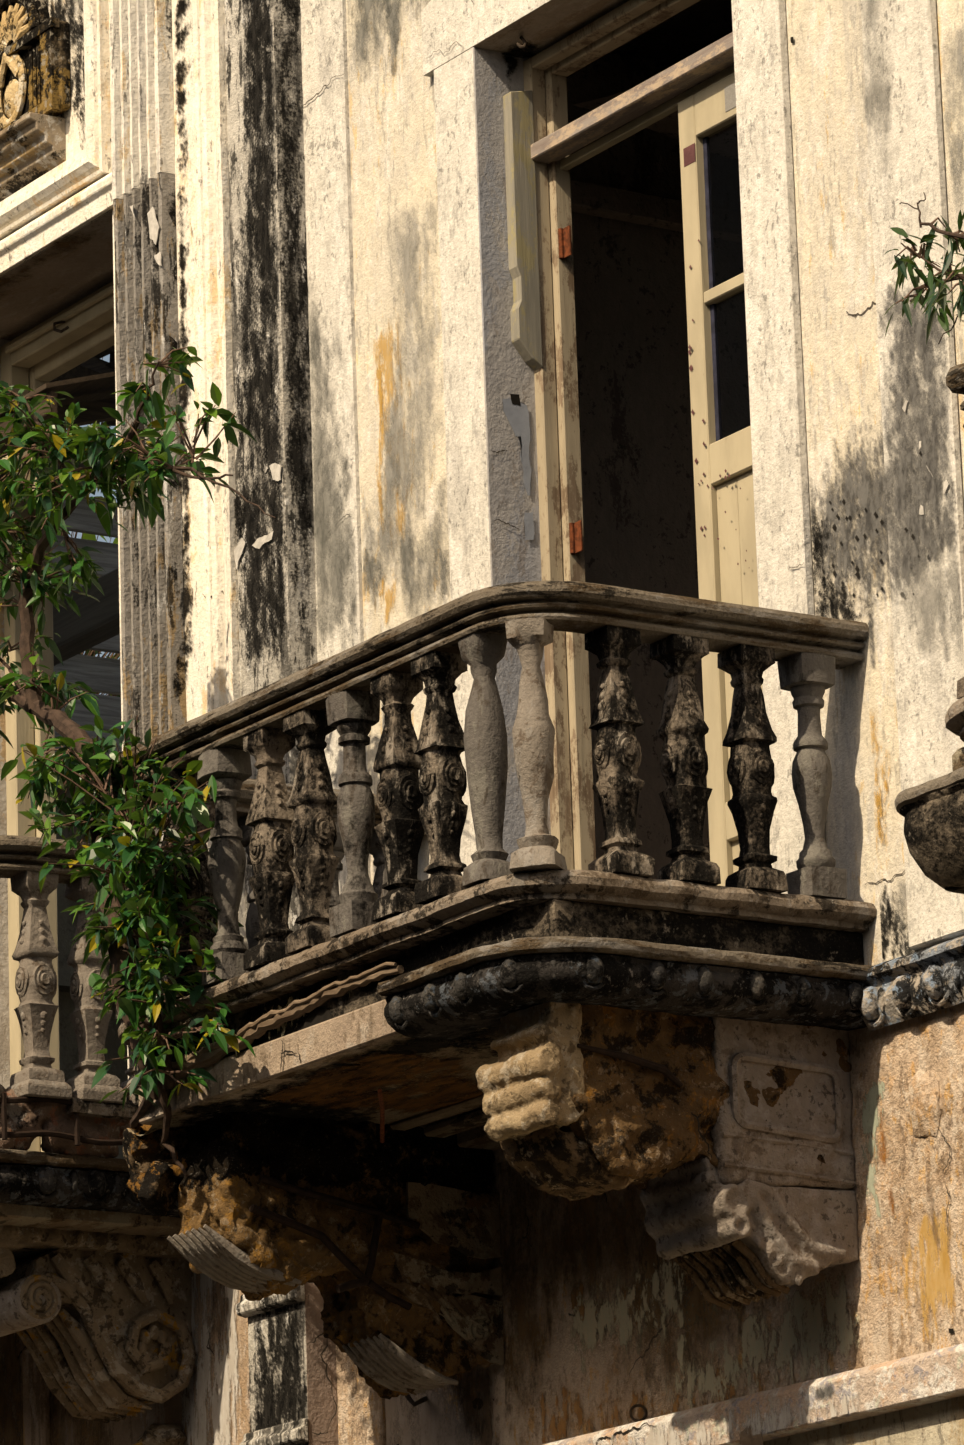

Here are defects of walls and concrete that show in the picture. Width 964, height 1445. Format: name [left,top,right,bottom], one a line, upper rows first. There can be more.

water stain [166,0,189,170]
water stain [503,43,539,80]
water stain [232,0,446,669]
water stain [165,187,193,703]
water stain [811,284,961,667]
crack [939,1130,951,1235]
water stain [210,1280,228,1344]
water stain [248,1305,306,1432]
peeling [538,1258,860,1445]